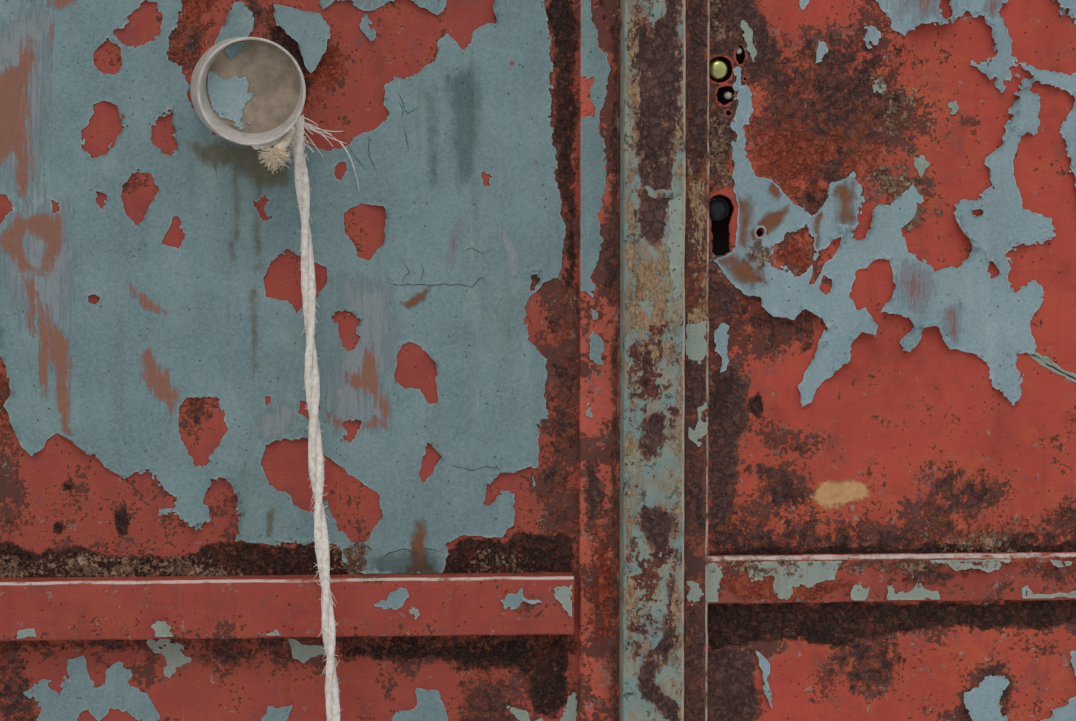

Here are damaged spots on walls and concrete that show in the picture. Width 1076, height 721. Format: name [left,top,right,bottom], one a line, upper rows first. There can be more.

peeling [78,99,128,161]
peeling [91,0,501,184]
peeling [94,164,163,228]
peeling [713,0,1076,407]
peeling [258,0,611,574]
corrosion [405,0,1076,721]
peeling [0,321,315,559]
peeling [745,561,842,600]
peeling [23,655,160,721]
corrosion [0,634,577,721]
peeling [391,688,448,721]
peeling [963,675,1010,721]